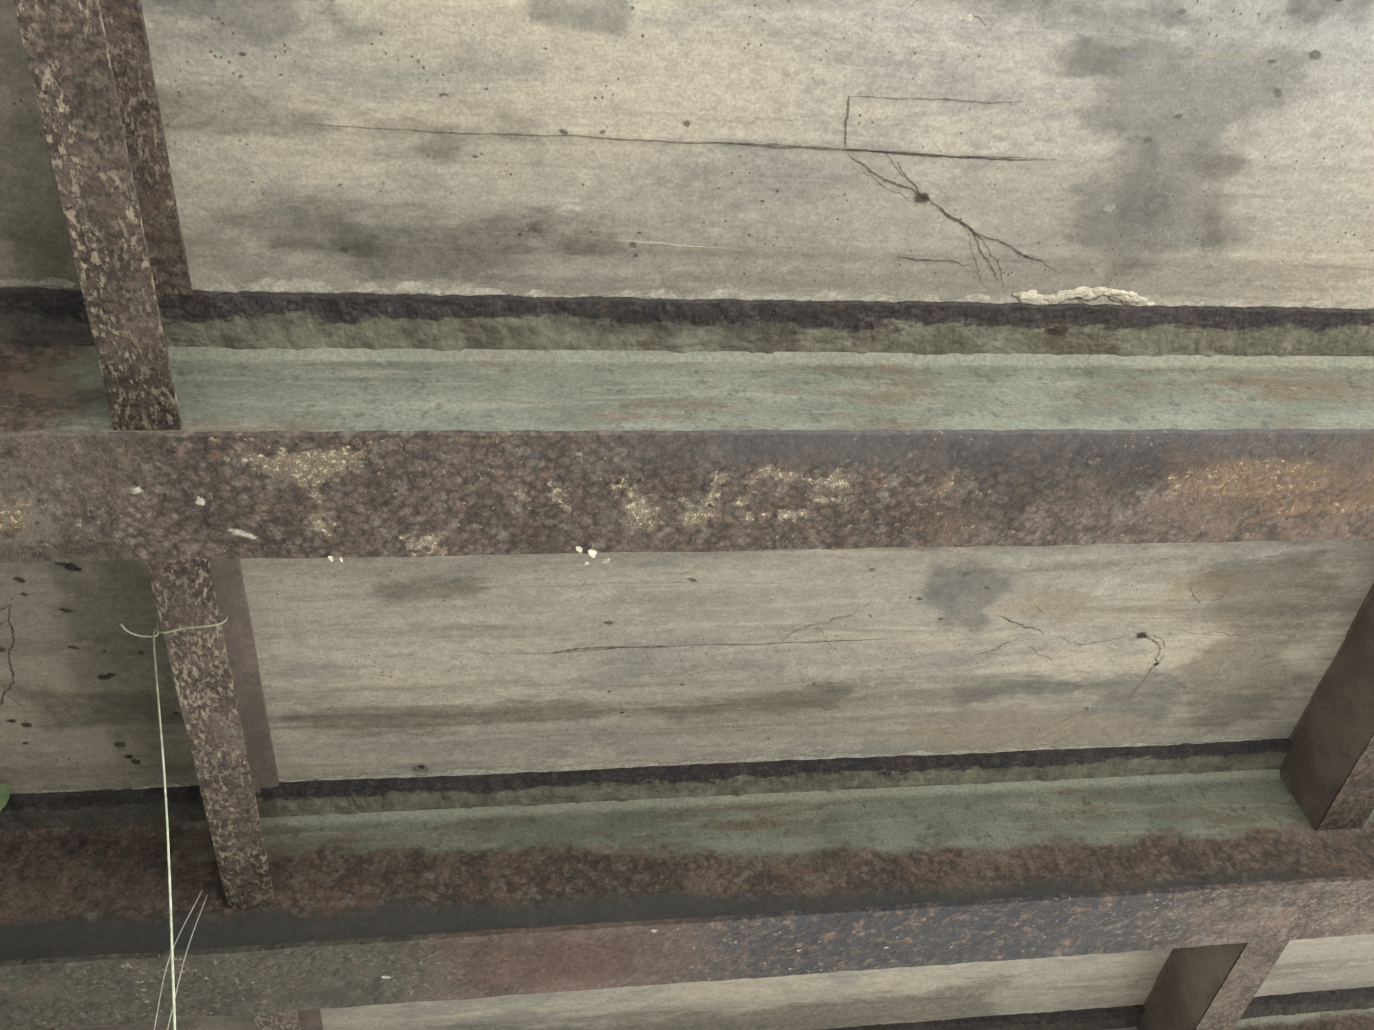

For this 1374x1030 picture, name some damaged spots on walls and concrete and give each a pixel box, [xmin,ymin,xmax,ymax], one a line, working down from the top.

crack [844,96,1060,280]
leakage [191,277,1374,309]
crack [0,605,15,706]
crack [1122,632,1165,705]